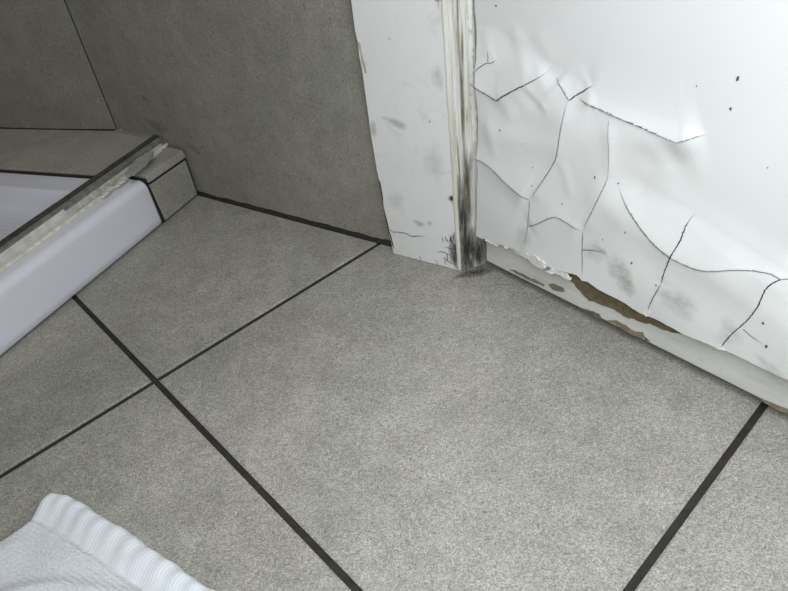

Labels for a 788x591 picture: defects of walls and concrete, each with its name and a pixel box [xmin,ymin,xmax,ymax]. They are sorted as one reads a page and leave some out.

water stain [458,160,485,276]
crack [473,51,703,266]
peeling [467,0,788,380]
crack [621,195,787,347]